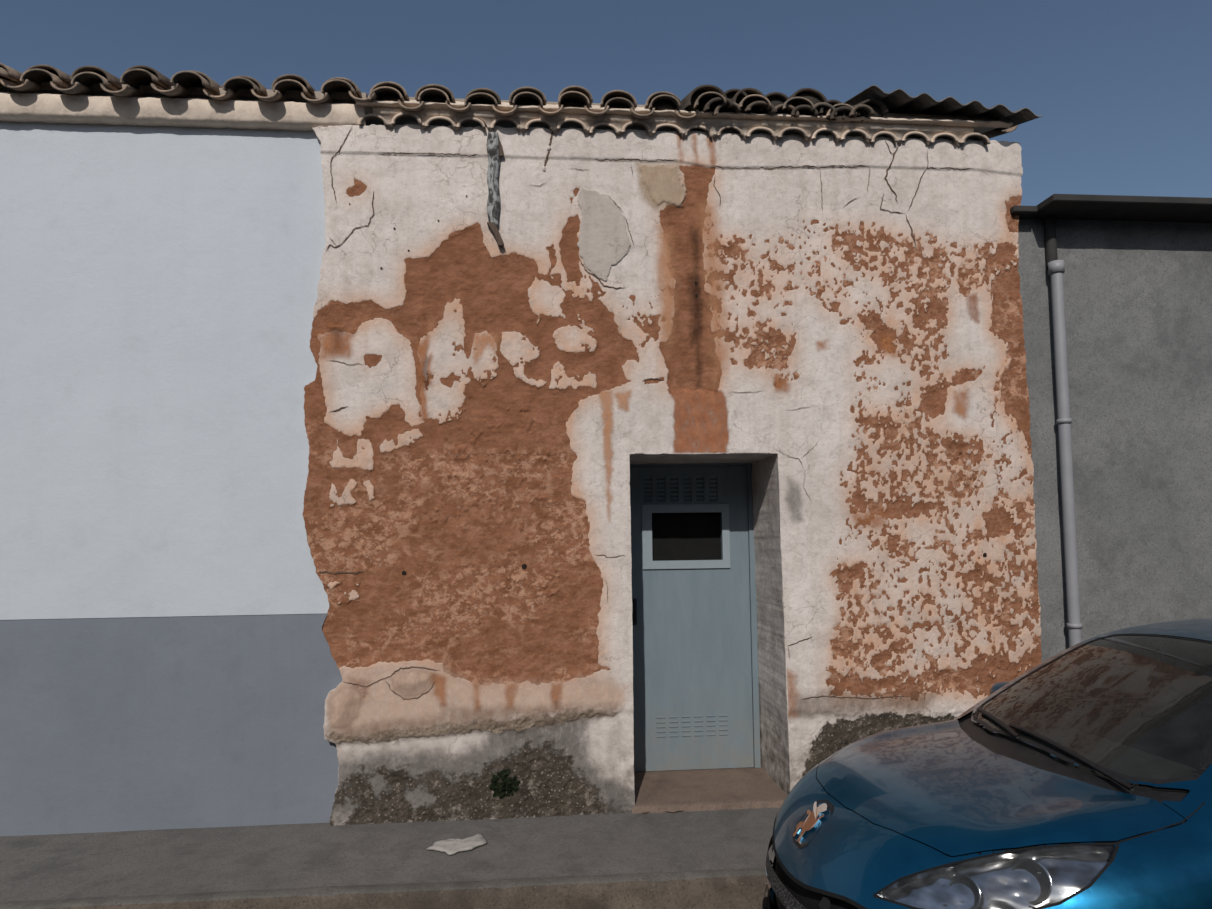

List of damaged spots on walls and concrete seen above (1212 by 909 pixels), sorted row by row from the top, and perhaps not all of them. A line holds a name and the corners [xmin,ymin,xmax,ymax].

crack [330,127,352,203]
crack [326,190,374,251]
crack [382,150,480,158]
crack [713,140,989,247]
peeling [303,165,1042,777]
crack [345,666,440,700]
flaking render [325,709,625,826]
damp [335,720,633,816]